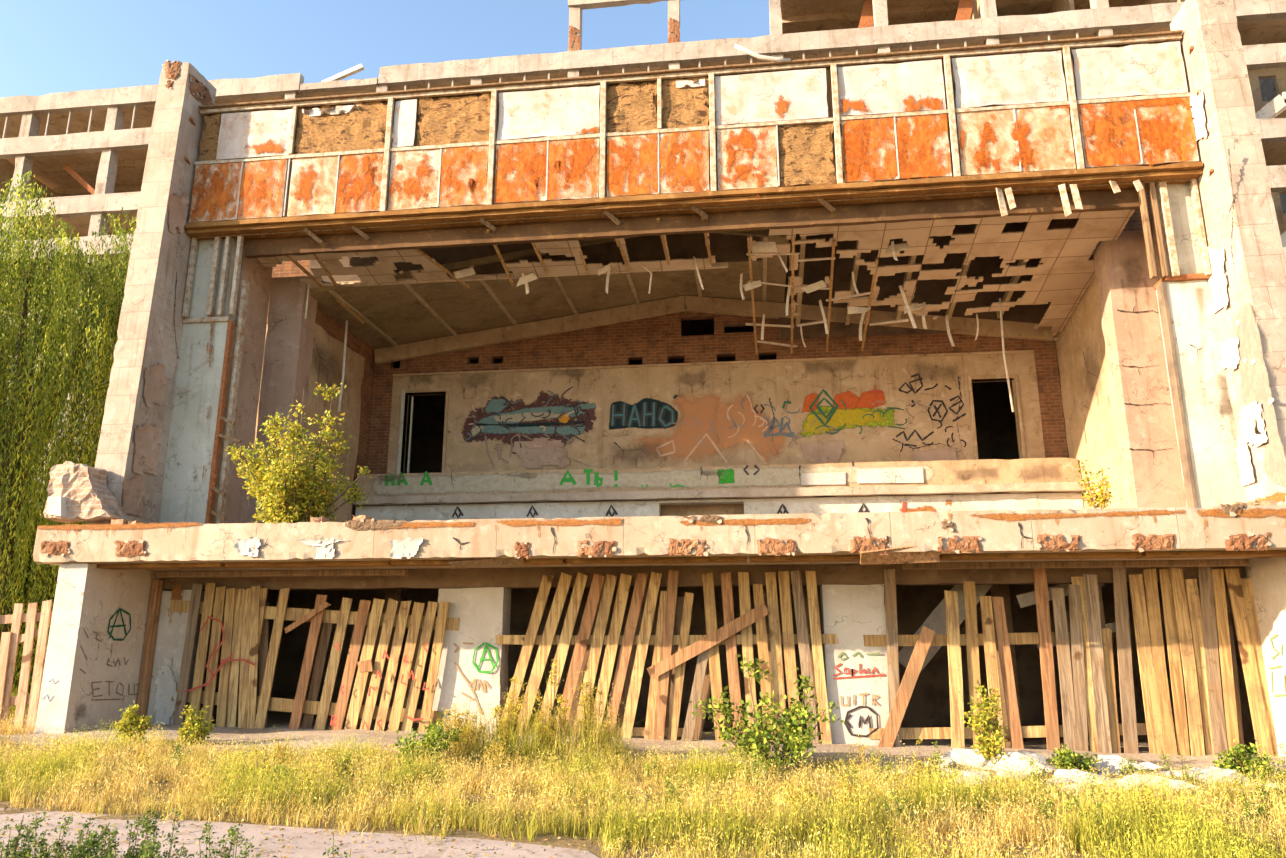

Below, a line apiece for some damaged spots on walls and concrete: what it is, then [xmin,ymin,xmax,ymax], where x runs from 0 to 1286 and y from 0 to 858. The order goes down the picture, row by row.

spalling [164,60,214,105]
rust [190,95,788,221]
flaking render [1207,246,1286,487]
spalling [1220,504,1246,517]
spalling [40,540,71,557]
spalling [114,539,147,557]
spalling [669,538,709,557]
spalling [757,537,796,556]
spalling [849,535,889,555]
spalling [934,521,982,554]
spalling [1131,533,1176,552]
spalling [1224,532,1272,551]